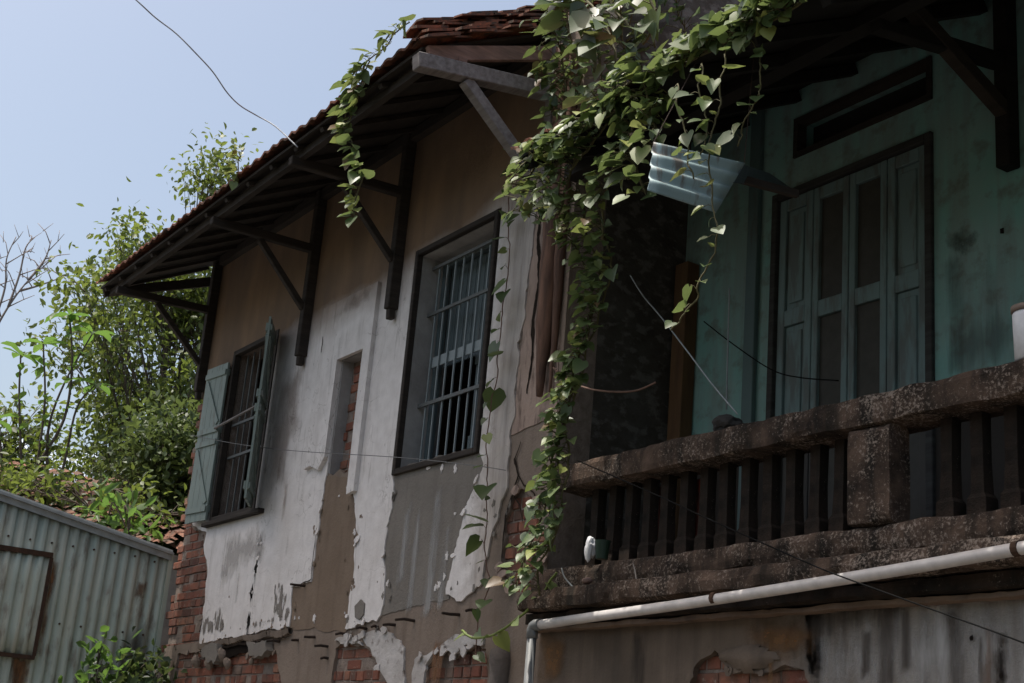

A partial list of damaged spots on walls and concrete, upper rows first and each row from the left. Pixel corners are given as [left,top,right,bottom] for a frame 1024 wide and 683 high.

peeling [240,361,488,683]
flaking render [483,484,548,594]
flaking render [685,656,809,683]
leakage [859,607,1024,683]